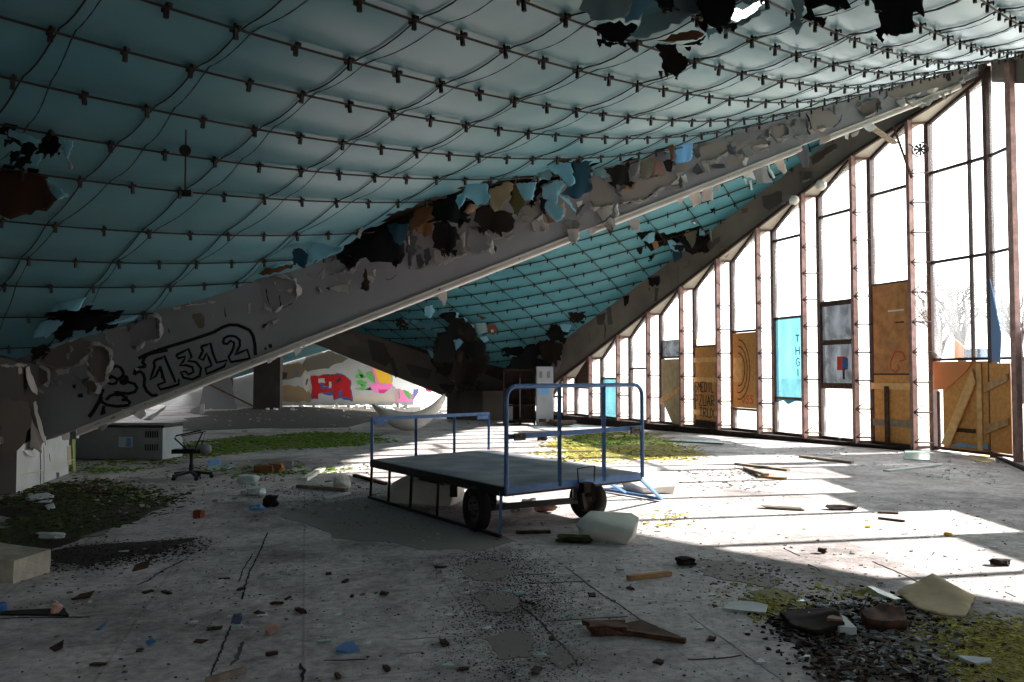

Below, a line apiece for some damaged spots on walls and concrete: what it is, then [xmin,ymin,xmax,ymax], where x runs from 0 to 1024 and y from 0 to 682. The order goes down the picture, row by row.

spalling [564,67,973,243]
spalling [522,200,549,232]
peeling [406,232,467,270]
peeling [485,230,513,255]
spalling [325,253,389,291]
spalling [0,331,114,453]
peeling [111,403,167,420]
crack [238,532,268,600]
crack [210,625,244,676]